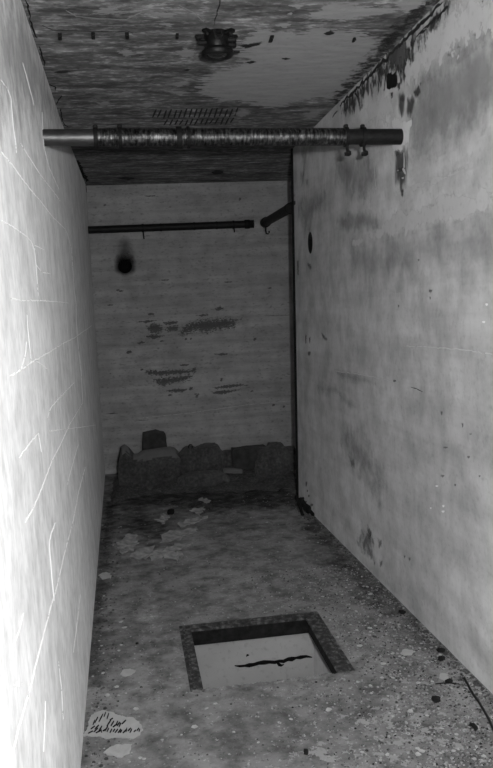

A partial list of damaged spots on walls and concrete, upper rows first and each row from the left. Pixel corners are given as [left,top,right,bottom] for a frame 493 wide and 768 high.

damp [358,529,382,566]